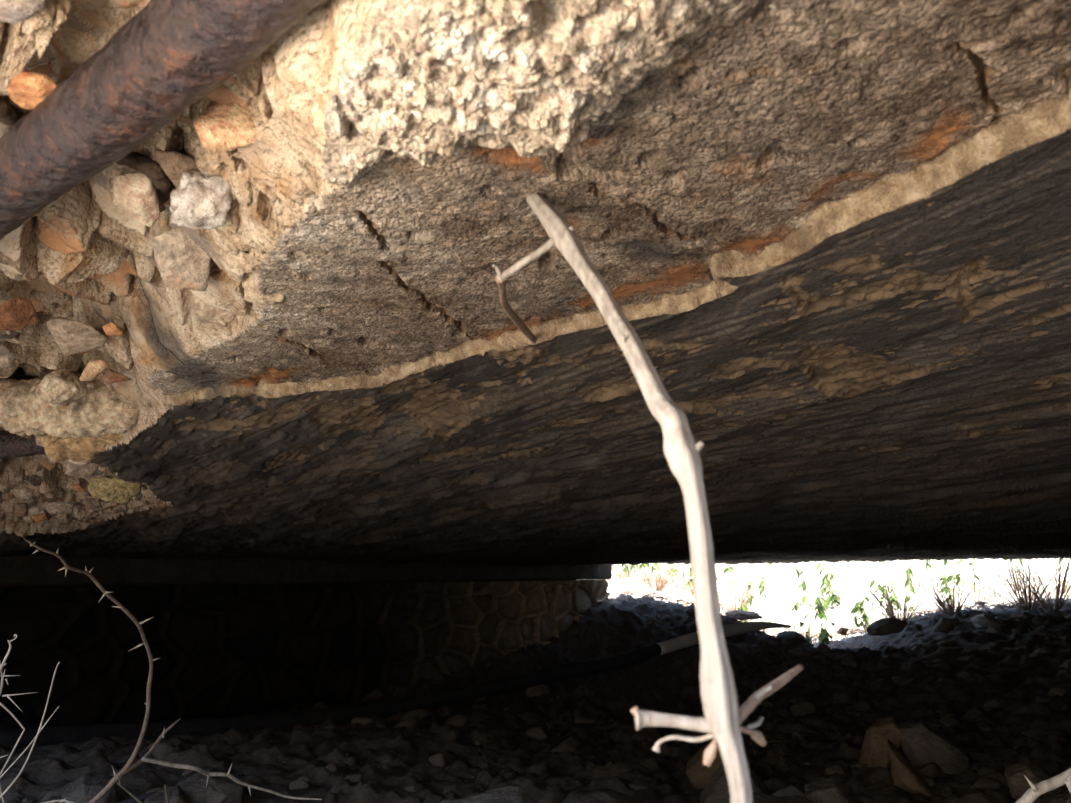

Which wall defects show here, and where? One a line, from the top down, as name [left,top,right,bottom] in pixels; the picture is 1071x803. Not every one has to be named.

crack [943,32,1009,114]
crack [354,210,476,340]
peeling [0,0,1071,537]
rust [573,294,596,309]